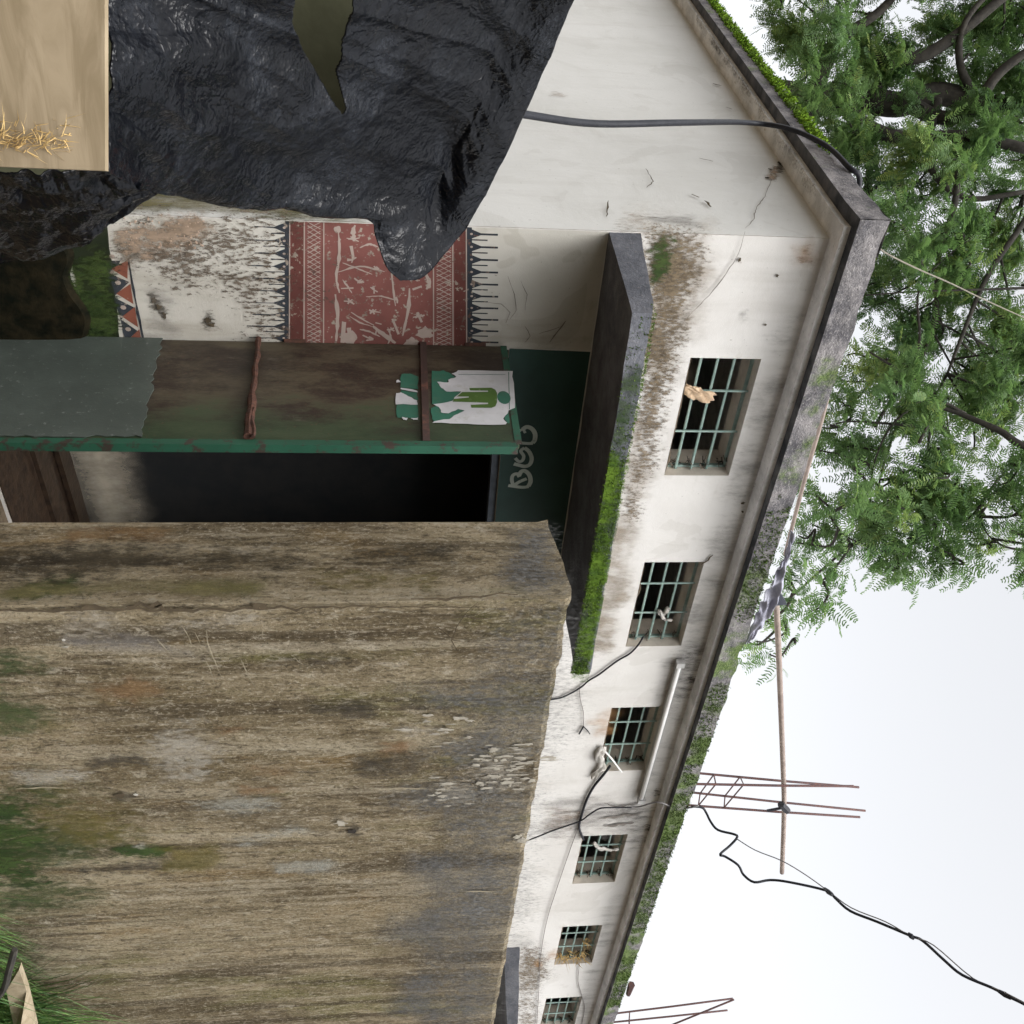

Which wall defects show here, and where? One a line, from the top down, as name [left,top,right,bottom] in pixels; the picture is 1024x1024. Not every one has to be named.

water stain [115,201,302,342]
crack [683,179,772,323]
water stain [616,223,709,540]
crack [0,592,518,653]
peeling [393,714,475,747]
peeling [423,777,474,807]
peeling [466,743,559,790]